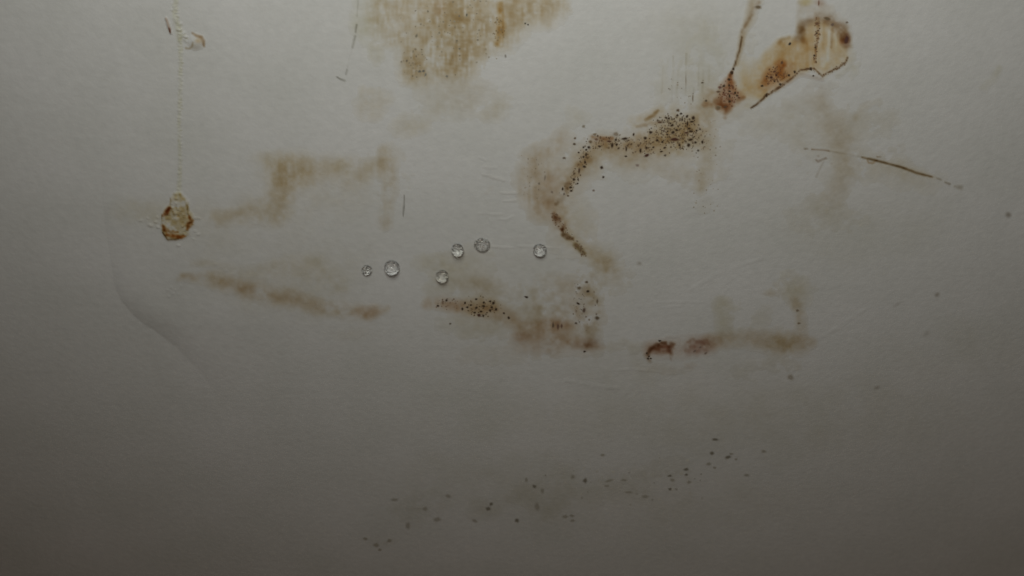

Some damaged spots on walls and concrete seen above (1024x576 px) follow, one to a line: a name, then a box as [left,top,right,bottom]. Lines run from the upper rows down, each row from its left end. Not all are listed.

flaking render [138,191,201,247]
leakage [175,0,574,340]
leakage [410,20,948,384]
crack [804,148,964,191]